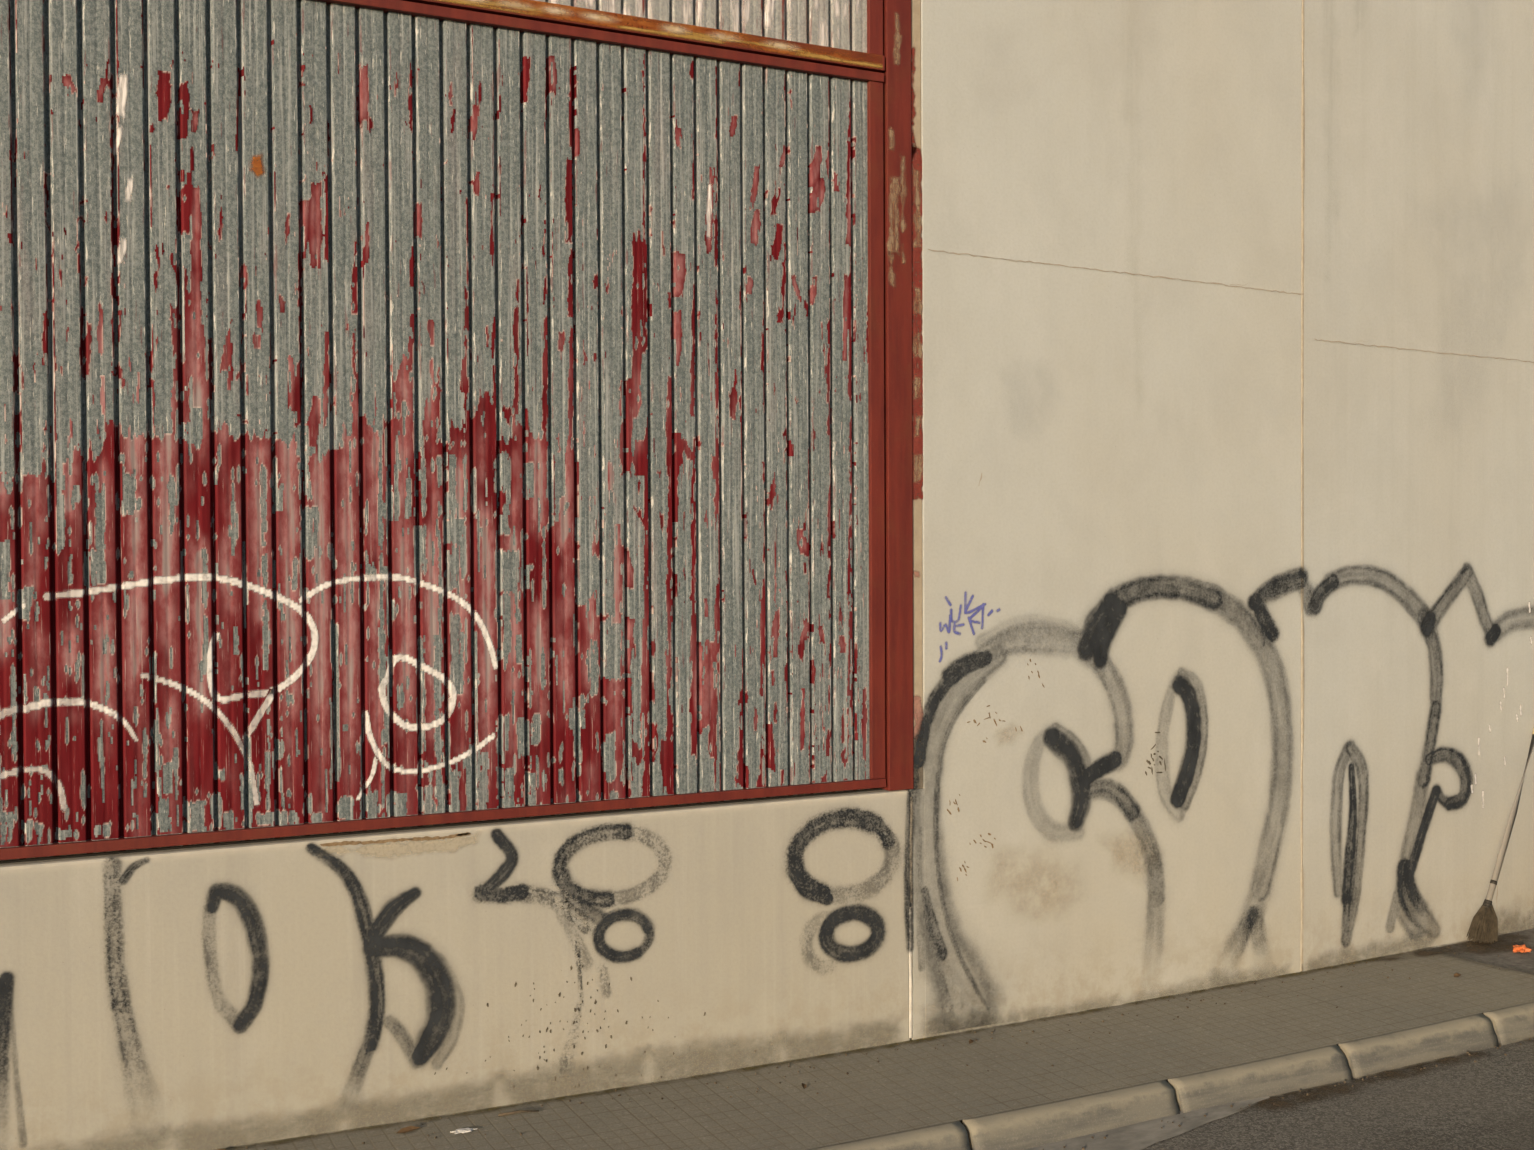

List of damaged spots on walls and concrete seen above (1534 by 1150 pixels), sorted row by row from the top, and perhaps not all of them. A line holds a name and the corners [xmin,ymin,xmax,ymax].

peeling [0,0,868,847]
peeling [887,14,923,500]
spalling [320,832,475,857]
peeling [913,696,924,739]